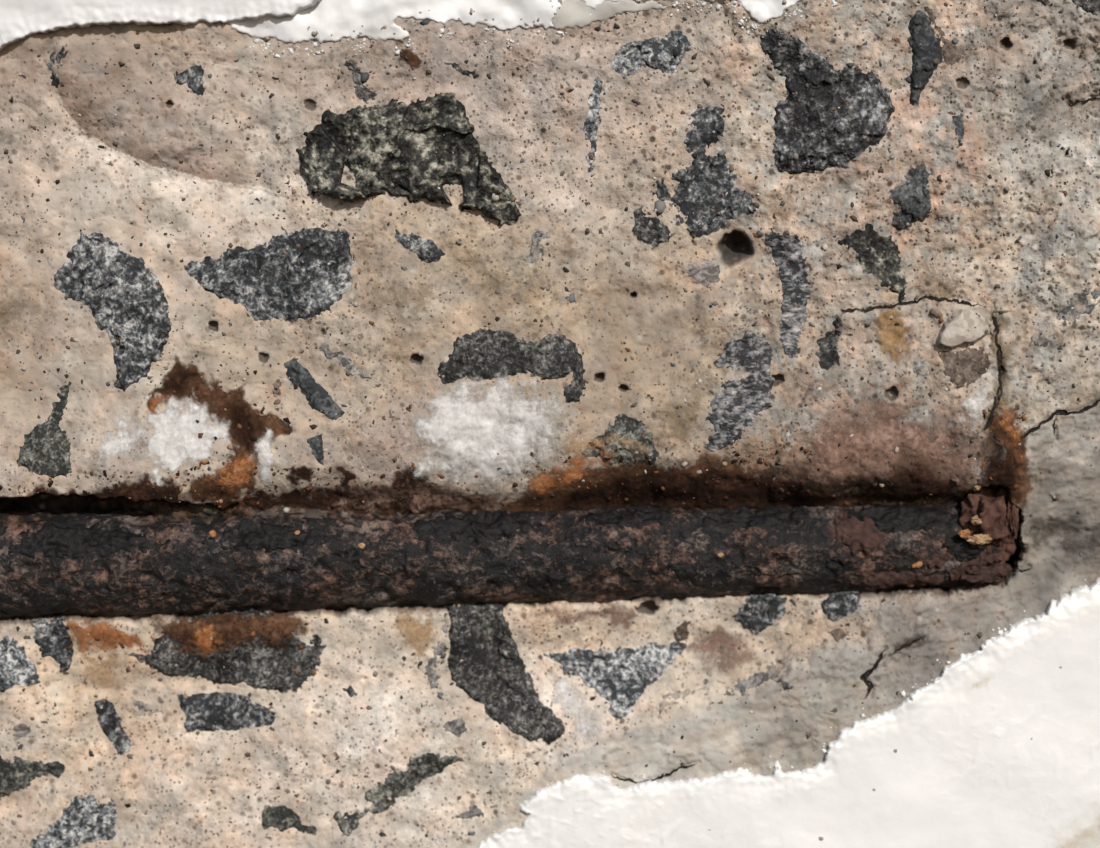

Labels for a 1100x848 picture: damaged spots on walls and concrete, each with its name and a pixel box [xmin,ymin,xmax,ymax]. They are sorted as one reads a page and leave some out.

spalling [0,0,1100,525]
crack [841,294,1004,433]
damp [99,398,228,485]
damp [256,429,274,483]
damp [415,378,559,483]
crack [1022,399,1100,438]
spalling [1006,497,1027,569]
spalling [0,577,1100,848]